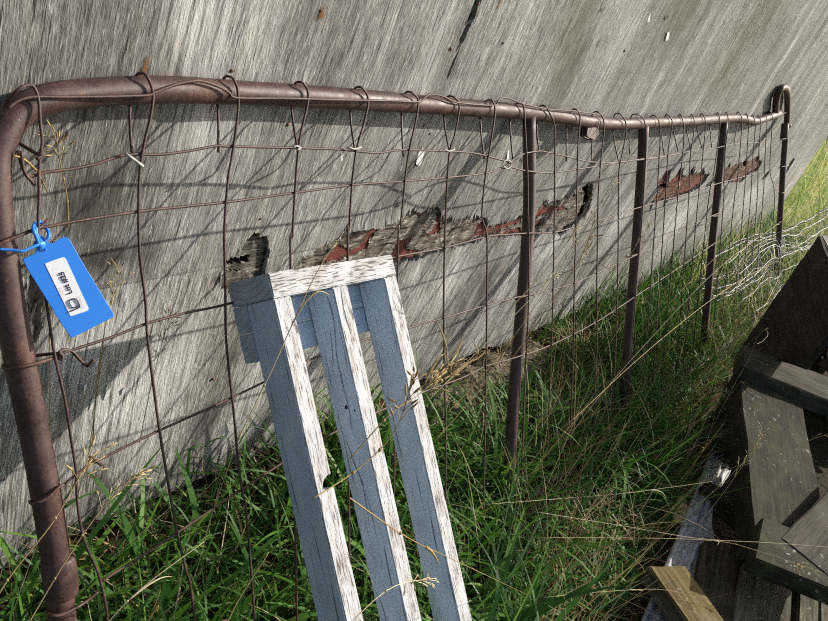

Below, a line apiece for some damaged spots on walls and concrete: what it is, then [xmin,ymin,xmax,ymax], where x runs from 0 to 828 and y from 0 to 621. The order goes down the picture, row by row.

crack [447,0,479,80]